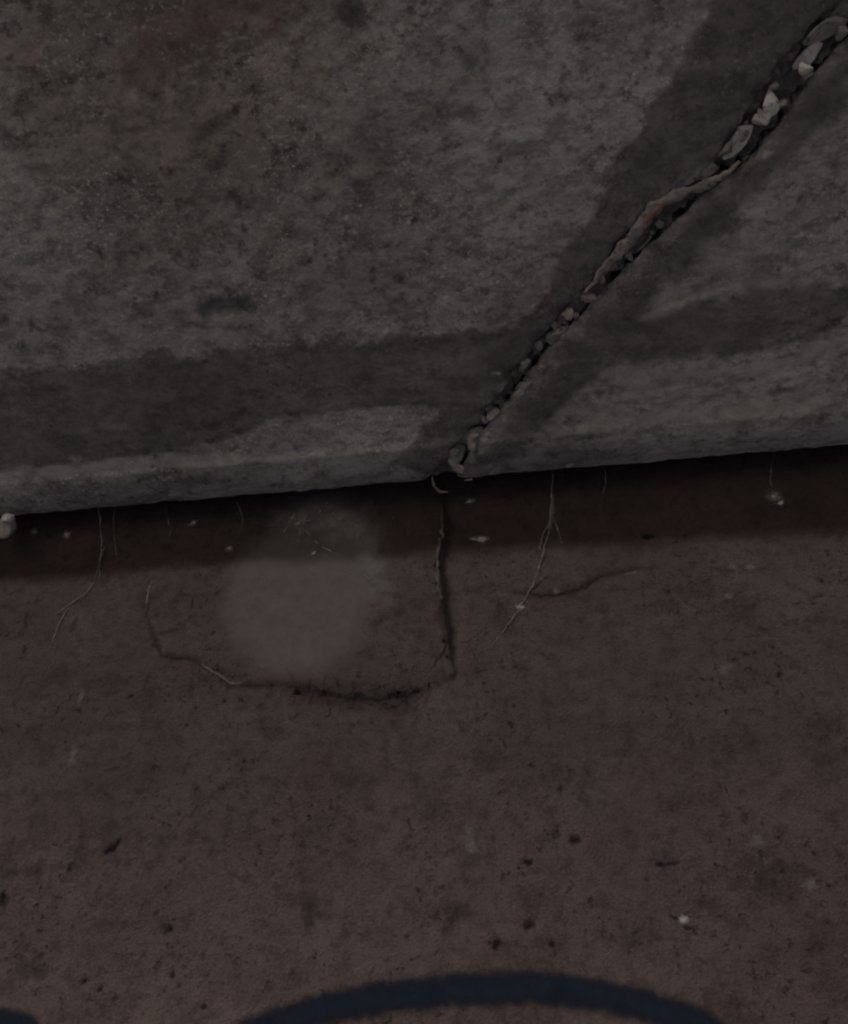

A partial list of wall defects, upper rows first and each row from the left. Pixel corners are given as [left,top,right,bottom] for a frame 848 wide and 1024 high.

crack [434,493,454,665]